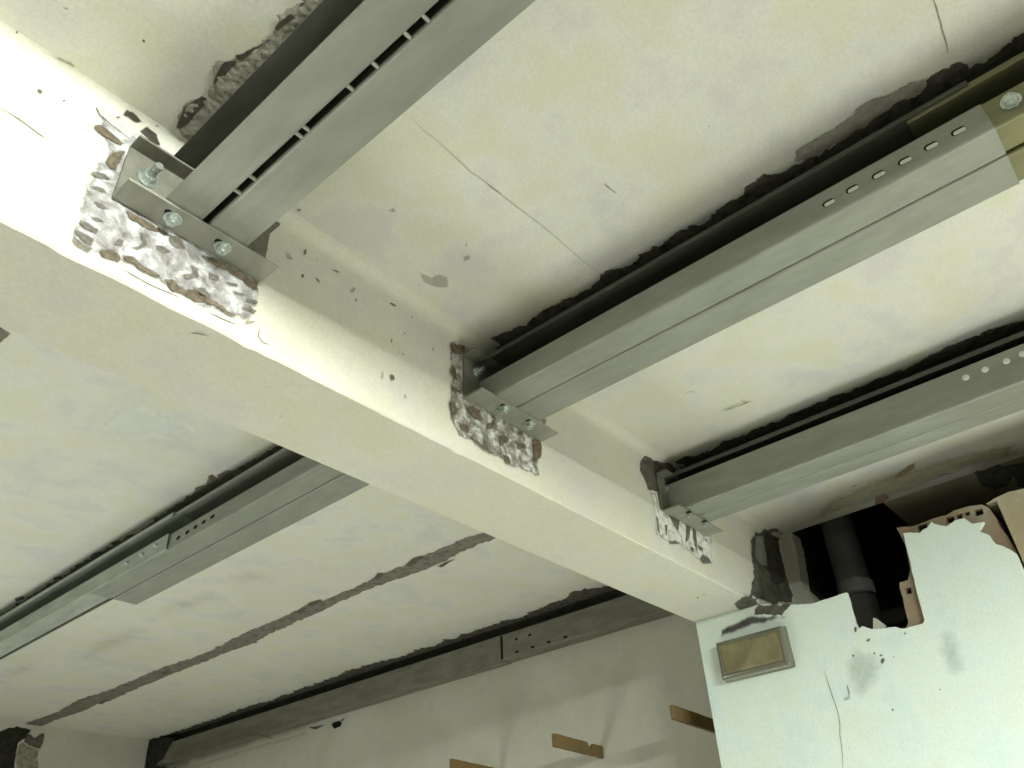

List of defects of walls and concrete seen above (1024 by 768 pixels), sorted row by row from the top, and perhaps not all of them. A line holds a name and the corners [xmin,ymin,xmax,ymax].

spalling [176,0,320,140]
spalling [95,125,123,145]
spalling [117,110,160,145]
crack [411,117,598,272]
spalling [735,529,793,615]
spalling [0,726,44,768]
spalling [145,586,616,768]
crack [824,671,850,765]